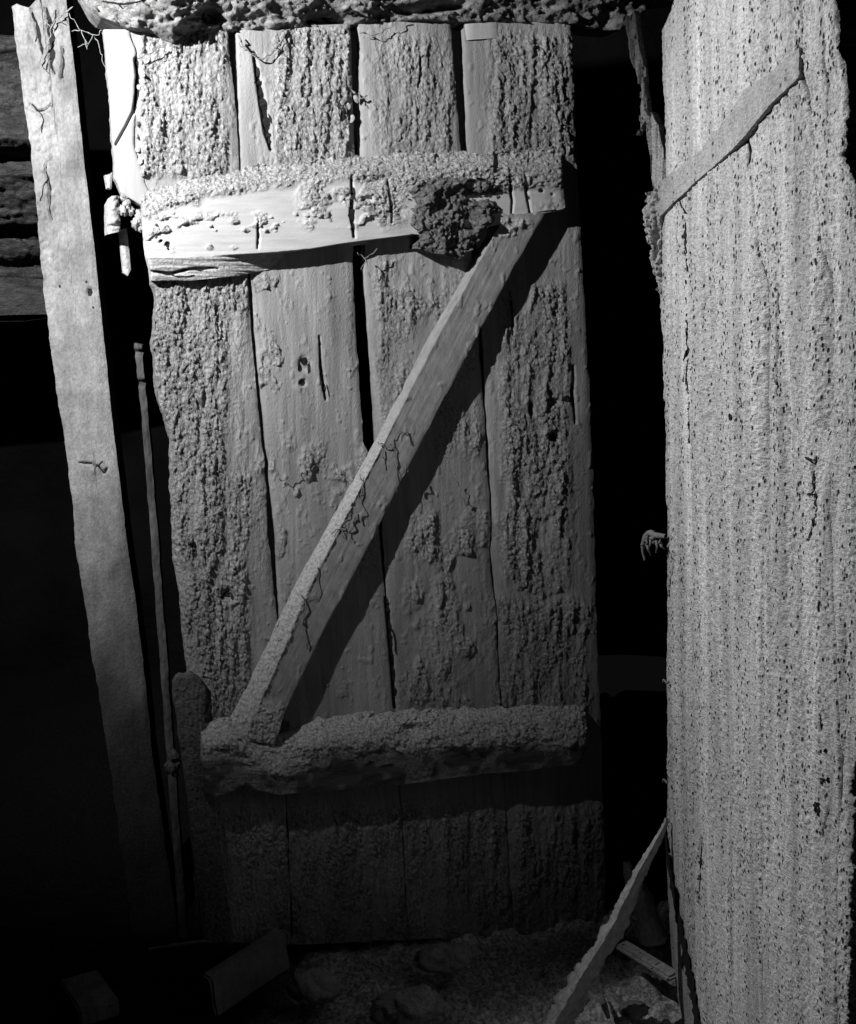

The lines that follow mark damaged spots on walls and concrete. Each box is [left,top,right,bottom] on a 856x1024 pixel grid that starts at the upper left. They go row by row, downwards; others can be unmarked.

crack [679,199,688,284]
crack [682,322,690,443]